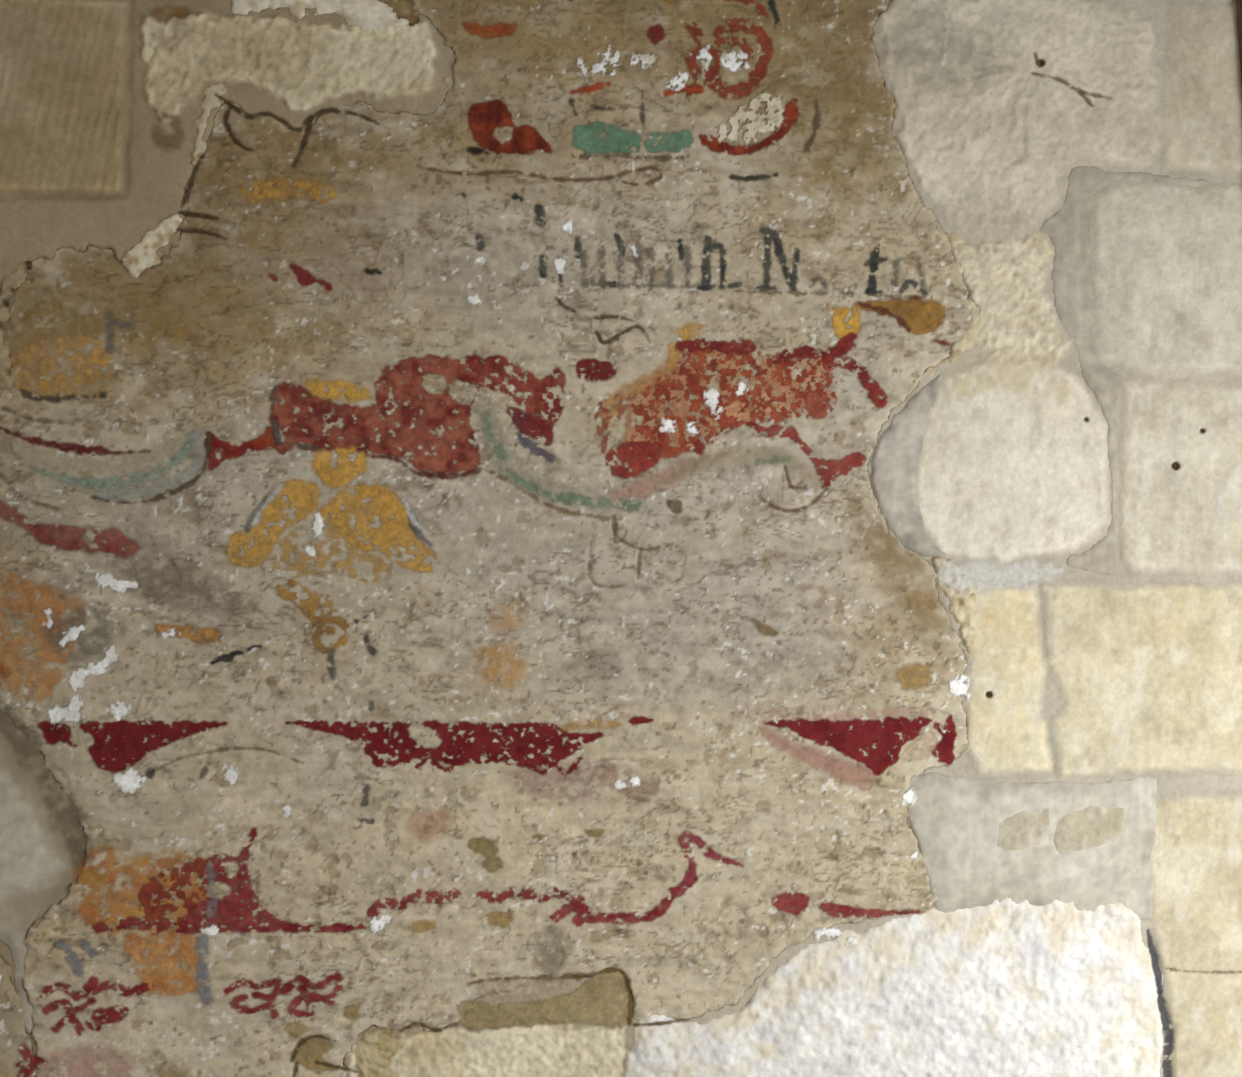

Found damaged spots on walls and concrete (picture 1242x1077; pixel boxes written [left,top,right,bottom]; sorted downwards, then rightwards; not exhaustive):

crack [215,94,375,167]
crack [177,155,222,238]
spalling [905,285,983,389]
spalling [932,556,977,653]
peeling [949,675,970,699]
peeling [284,1022,338,1071]
peeling [345,1005,359,1019]
peeling [356,1029,400,1077]
peeling [458,967,634,1031]
crack [1147,930,1241,1077]